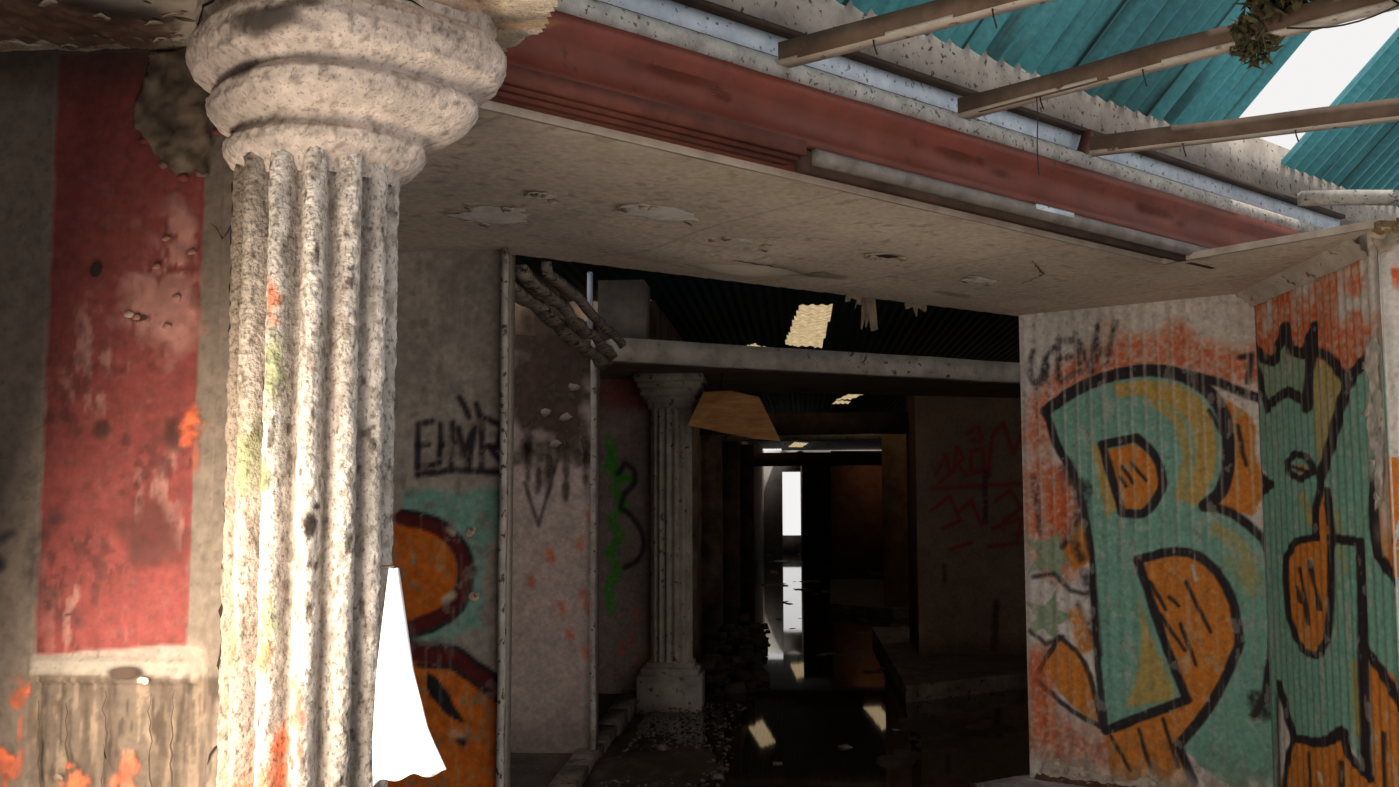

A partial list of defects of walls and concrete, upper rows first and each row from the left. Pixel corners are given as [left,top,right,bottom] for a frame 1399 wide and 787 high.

crack [197,0,215,26]
peeling [446,192,560,229]
water stain [514,291,604,500]